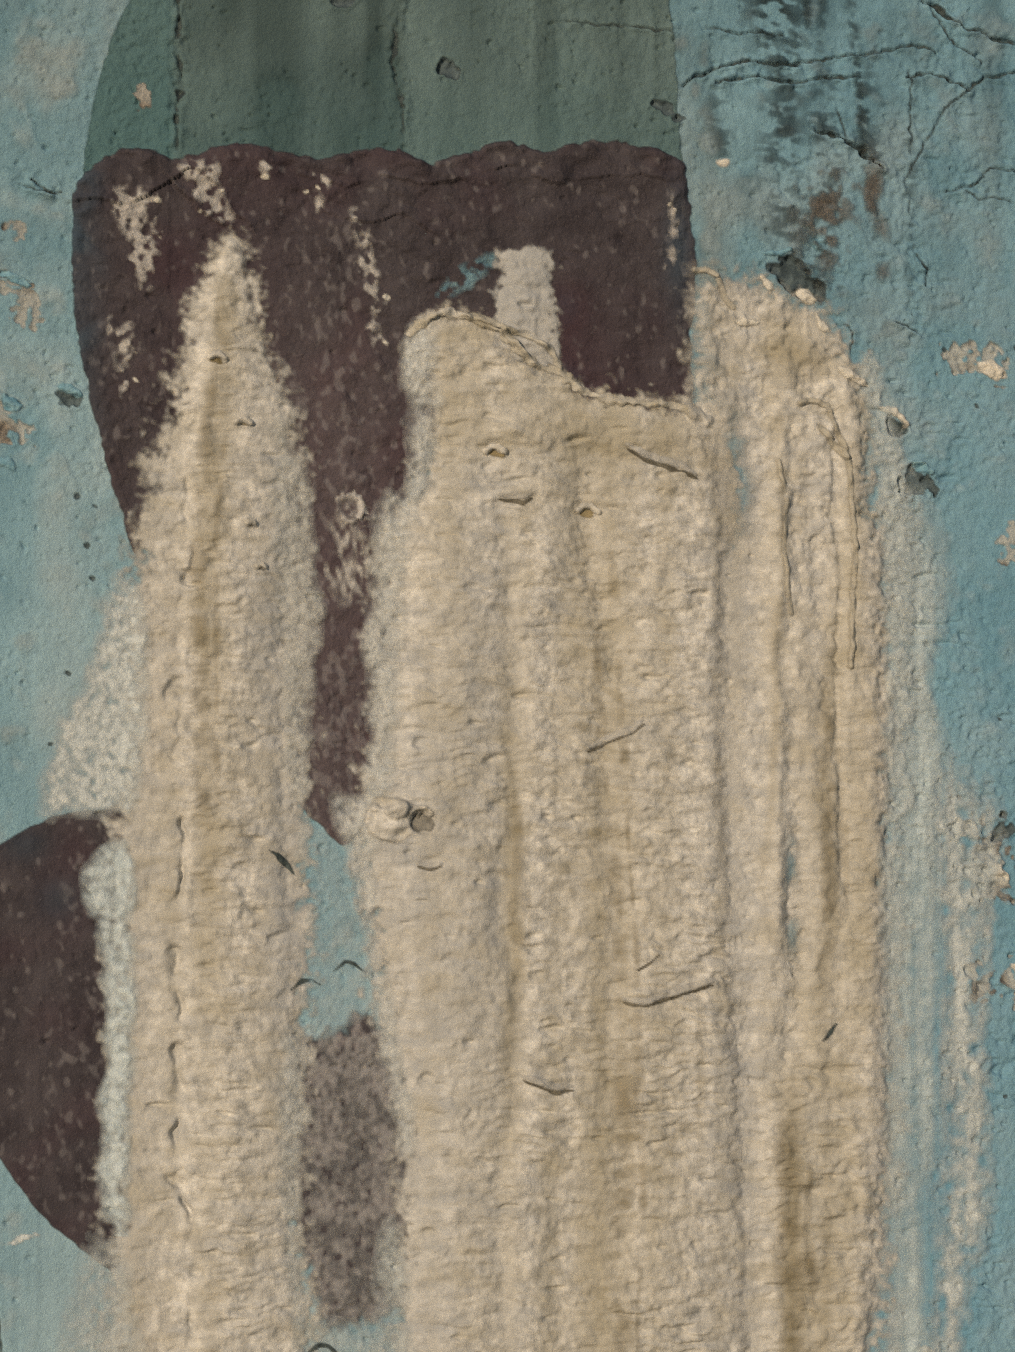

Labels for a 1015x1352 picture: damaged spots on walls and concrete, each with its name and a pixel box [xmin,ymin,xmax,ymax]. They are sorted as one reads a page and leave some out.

crack [692,5,1013,173]
spalling [936,340,1009,389]
spalling [0,393,34,471]
spalling [995,520,1015,566]
spalling [948,955,1015,1011]